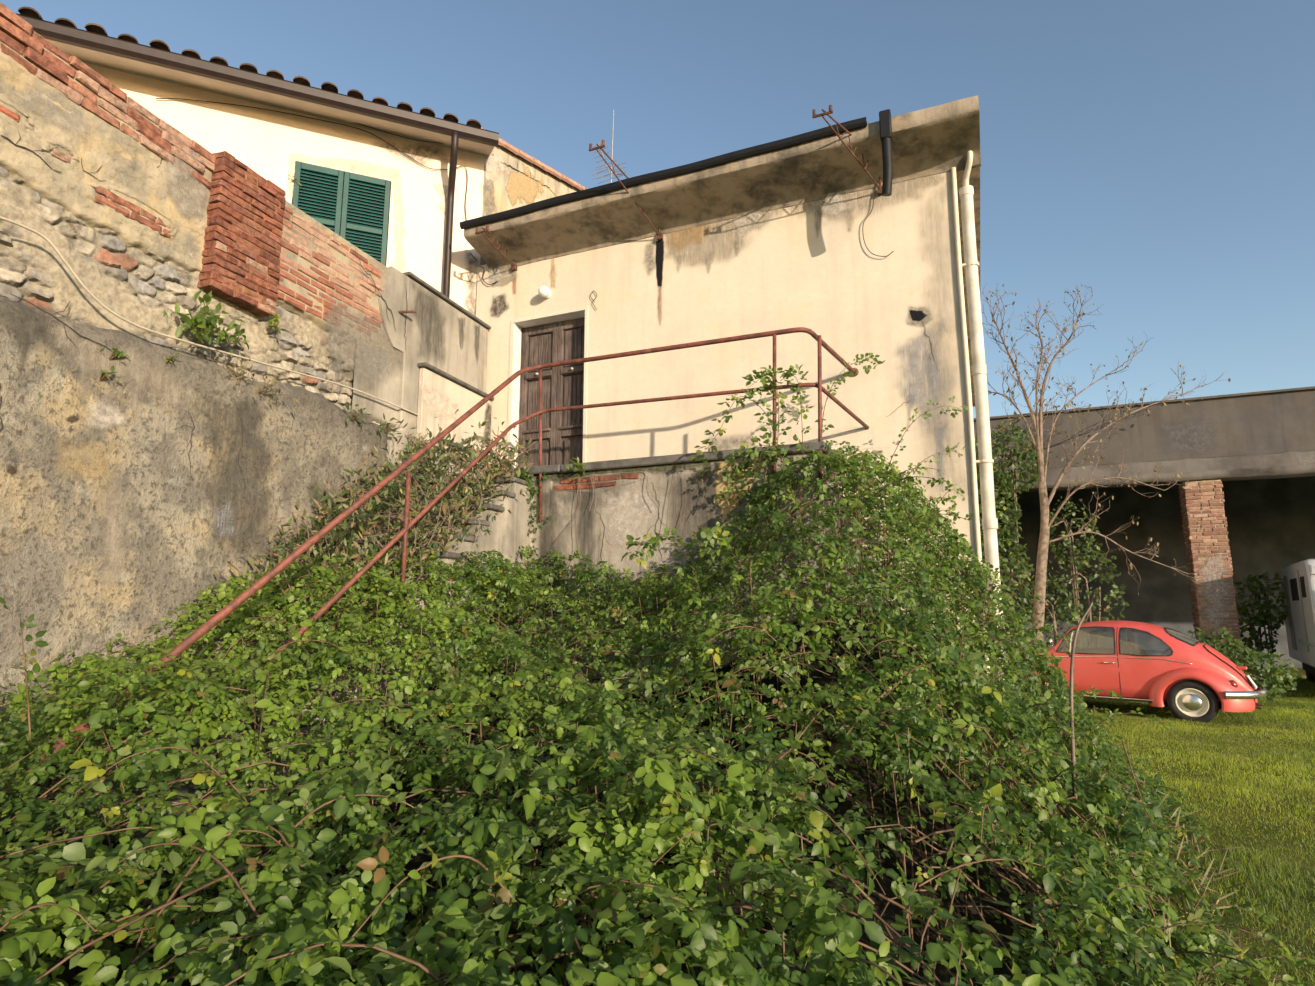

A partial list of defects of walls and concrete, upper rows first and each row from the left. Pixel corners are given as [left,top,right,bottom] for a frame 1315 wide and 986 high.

flaking render [0,93,80,170]
peeling [485,149,544,205]
flaking render [87,183,180,238]
water stain [668,209,777,269]
peeling [734,212,760,239]
water stain [795,175,938,236]
spalling [908,308,931,325]
water stain [901,325,946,478]
flaking render [548,471,650,494]